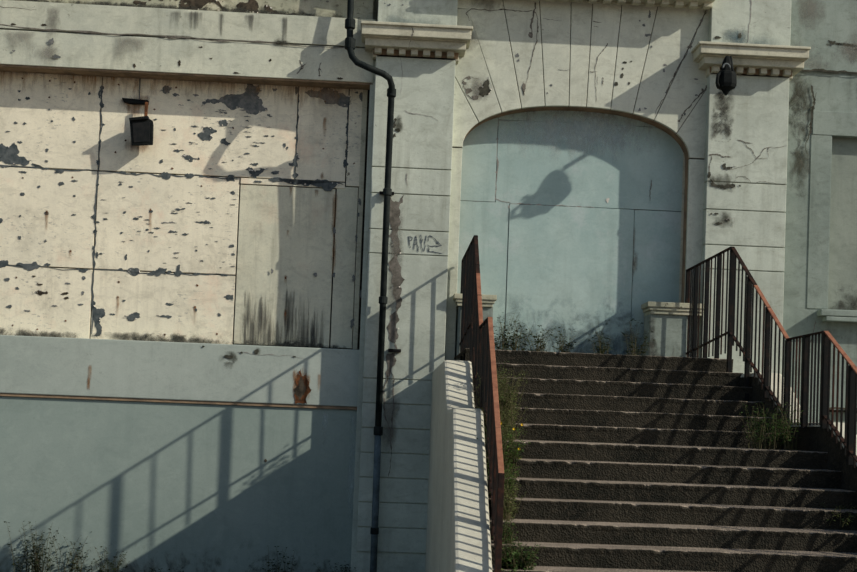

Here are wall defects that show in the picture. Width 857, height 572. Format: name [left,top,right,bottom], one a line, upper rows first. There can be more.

spalling [176,0,225,11]
spalling [236,0,279,13]
crack [827,40,857,50]
water stain [713,92,731,136]
crack [801,69,857,152]
peeling [161,84,363,191]
crack [709,140,784,185]
peeling [0,85,237,337]
water stain [244,298,337,348]
spalling [383,195,405,476]
corrosion [294,369,311,404]